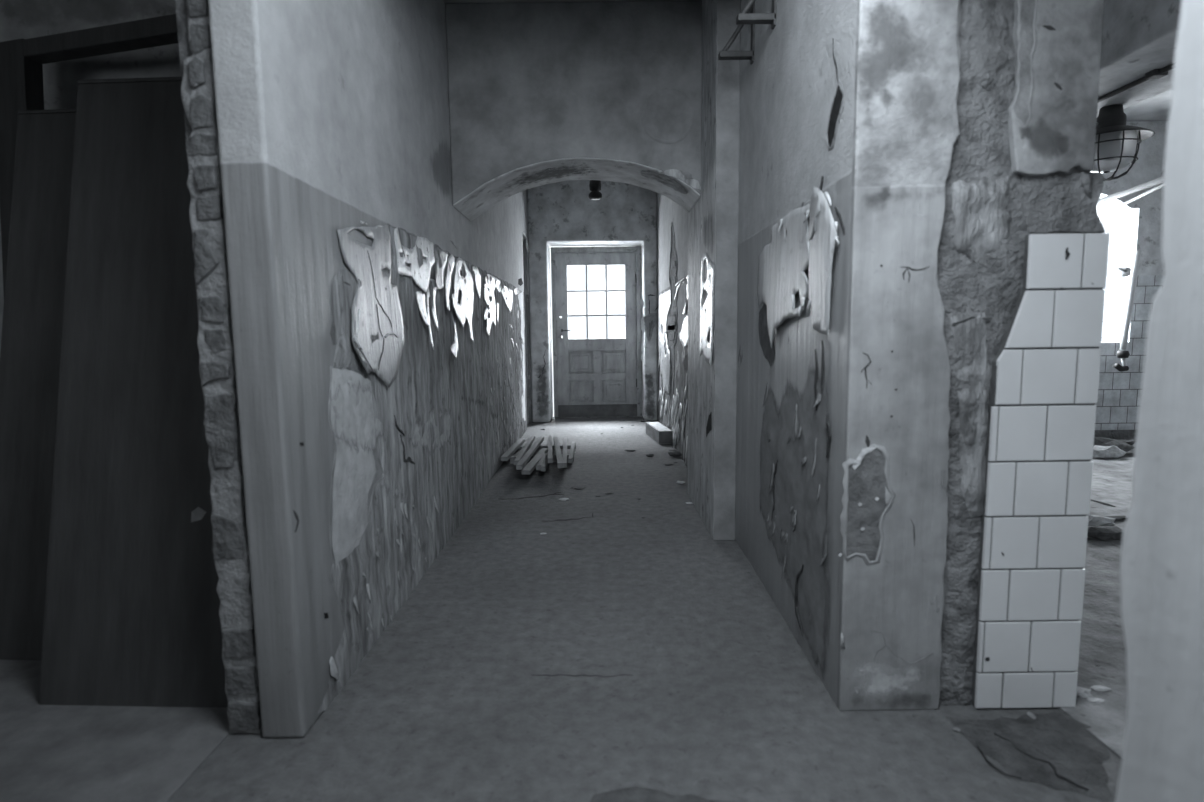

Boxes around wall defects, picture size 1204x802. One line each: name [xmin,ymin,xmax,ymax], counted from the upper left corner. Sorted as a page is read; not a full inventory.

spalling [1021,171,1105,234]
flaking render [640,222,714,466]
flaking render [758,303,775,367]
flaking render [317,221,524,714]